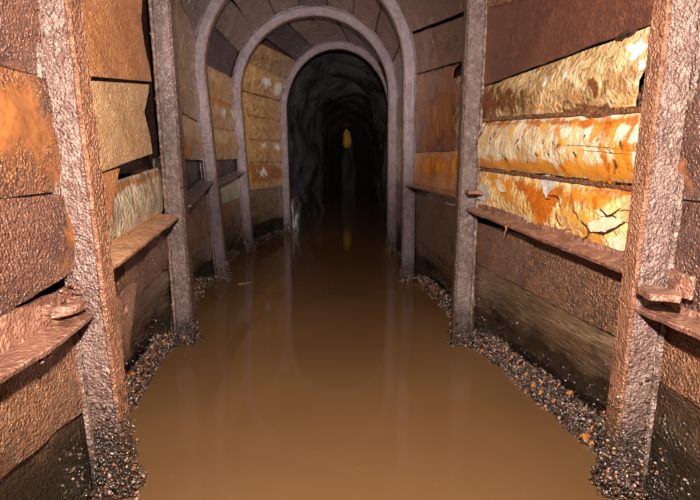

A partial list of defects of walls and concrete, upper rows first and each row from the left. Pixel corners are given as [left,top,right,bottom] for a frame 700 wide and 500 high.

damp [627,39,648,71]
damp [261,77,282,96]
corrosion [476,78,639,244]
peeling [478,179,506,202]
peeling [539,175,557,198]
crack [546,195,625,240]
peeling [587,195,631,251]